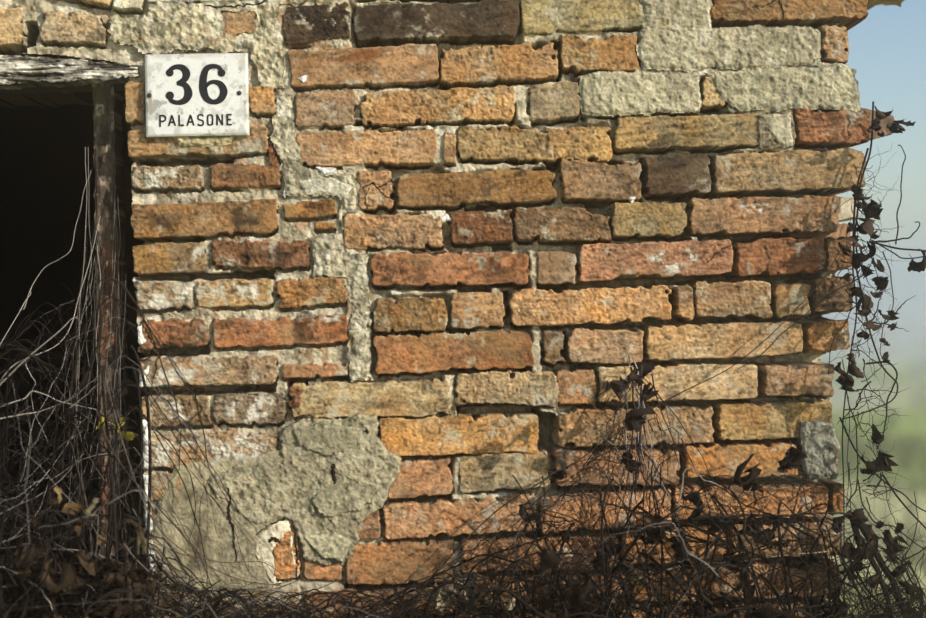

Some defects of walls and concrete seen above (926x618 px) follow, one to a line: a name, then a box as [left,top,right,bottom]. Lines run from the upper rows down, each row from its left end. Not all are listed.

crack [227,487,237,562]
spalling [207,413,402,584]